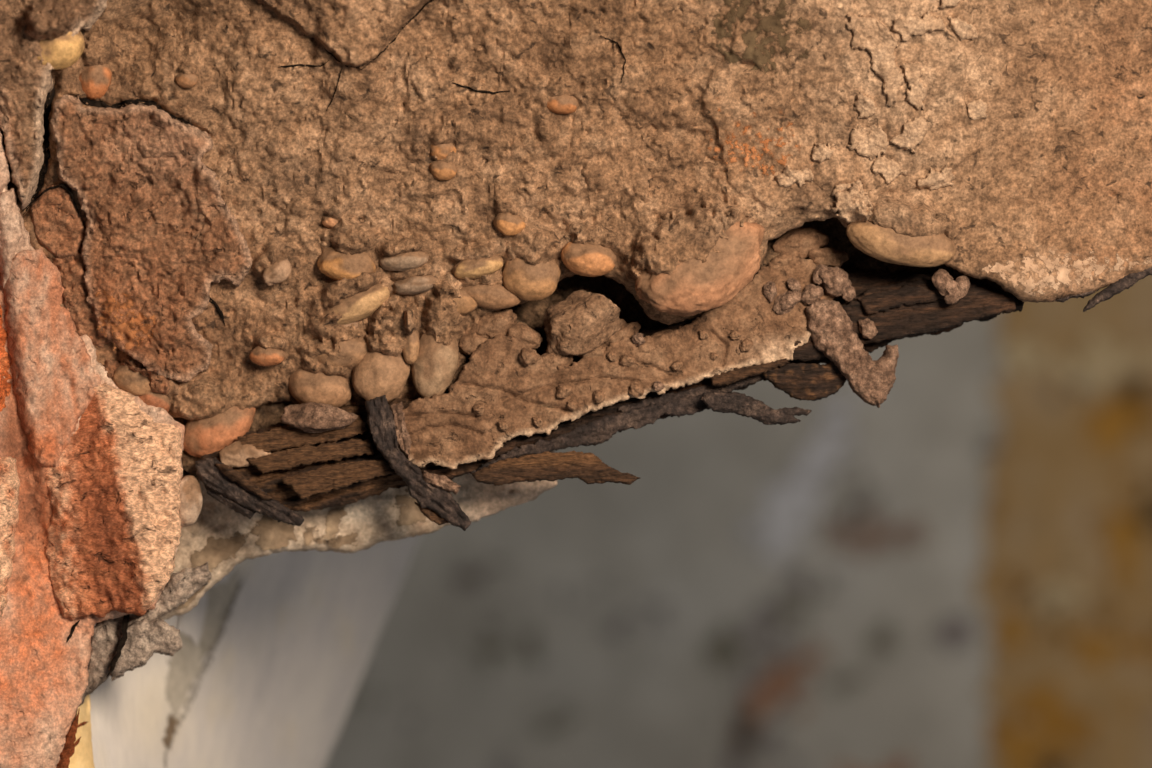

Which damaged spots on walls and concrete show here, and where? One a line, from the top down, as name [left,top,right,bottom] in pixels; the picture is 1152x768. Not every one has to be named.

crack [278,0,434,109]
crack [23,79,213,217]
spalling [753,180,1012,294]
crack [209,297,225,325]
spalling [448,274,674,393]
spalling [181,449,200,475]
spalling [249,402,358,433]